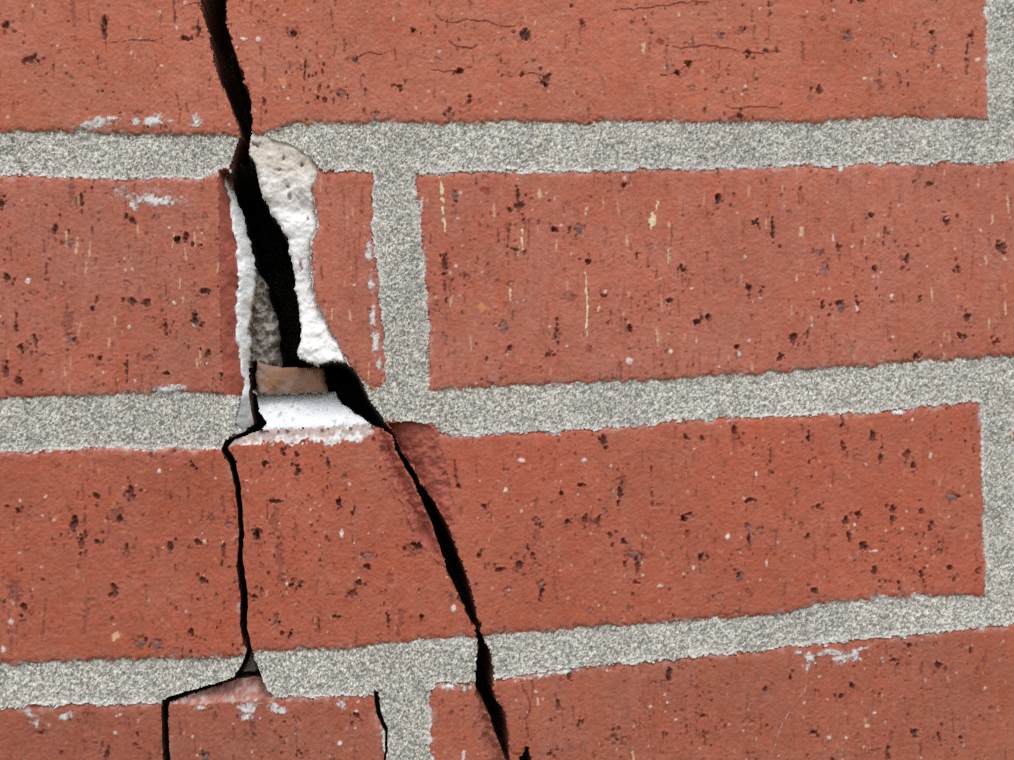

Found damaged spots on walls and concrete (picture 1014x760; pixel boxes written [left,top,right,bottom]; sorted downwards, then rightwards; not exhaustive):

crack [161,359,267,760]
spalling [217,130,509,569]
crack [184,0,562,760]